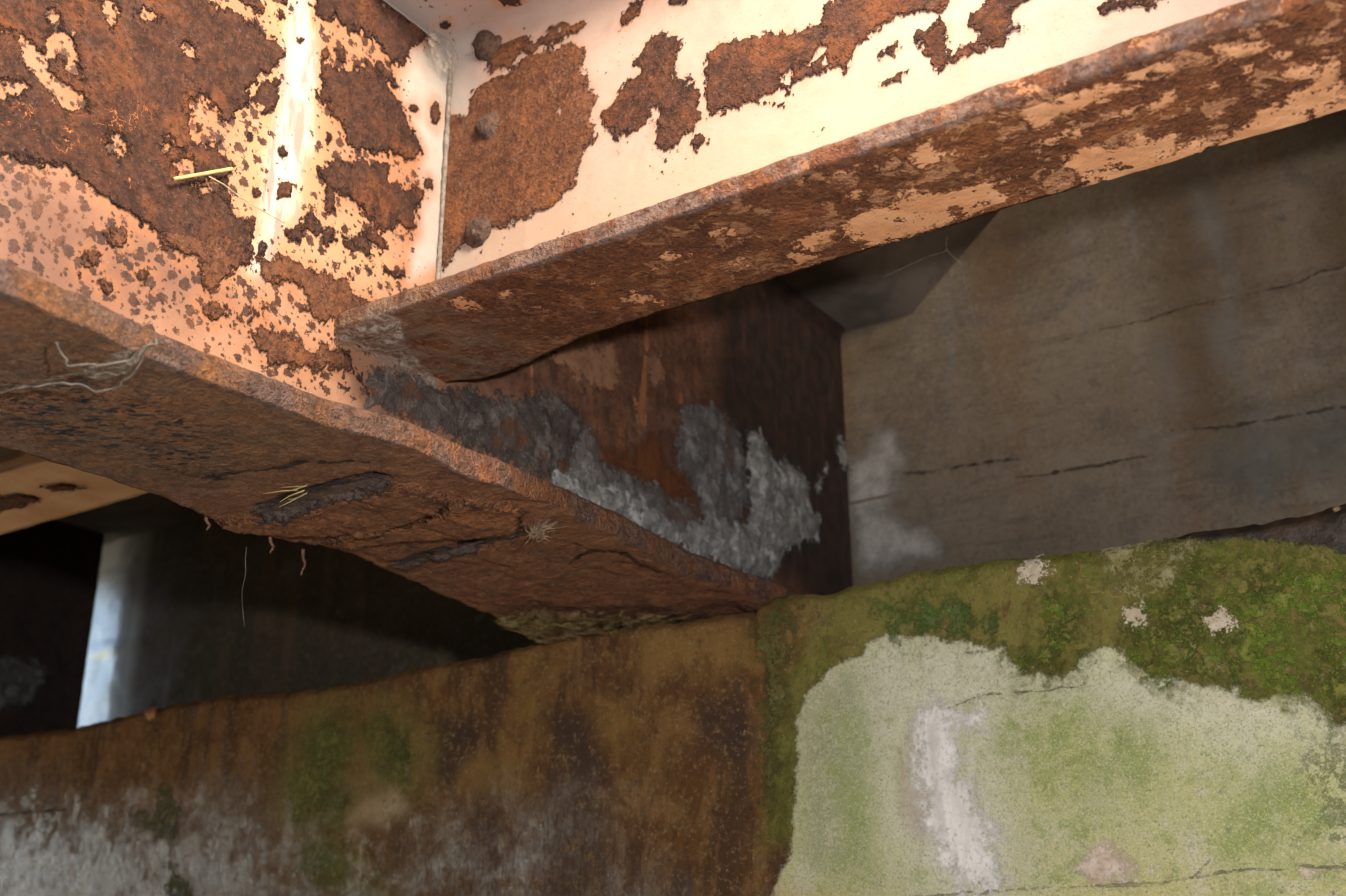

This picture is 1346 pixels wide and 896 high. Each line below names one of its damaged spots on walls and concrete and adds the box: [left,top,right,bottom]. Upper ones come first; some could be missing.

corrosion [1093,0,1158,16]
corrosion [0,0,1029,377]
peeling [781,138,1018,270]
peeling [708,227,741,237]
peeling [650,251,693,272]
crack [1184,405,1346,431]
crack [902,456,1145,478]
corrosion [0,483,87,512]
water stain [545,400,822,581]
water stain [0,435,1346,896]
crack [1095,859,1346,888]
crack [935,887,1046,896]